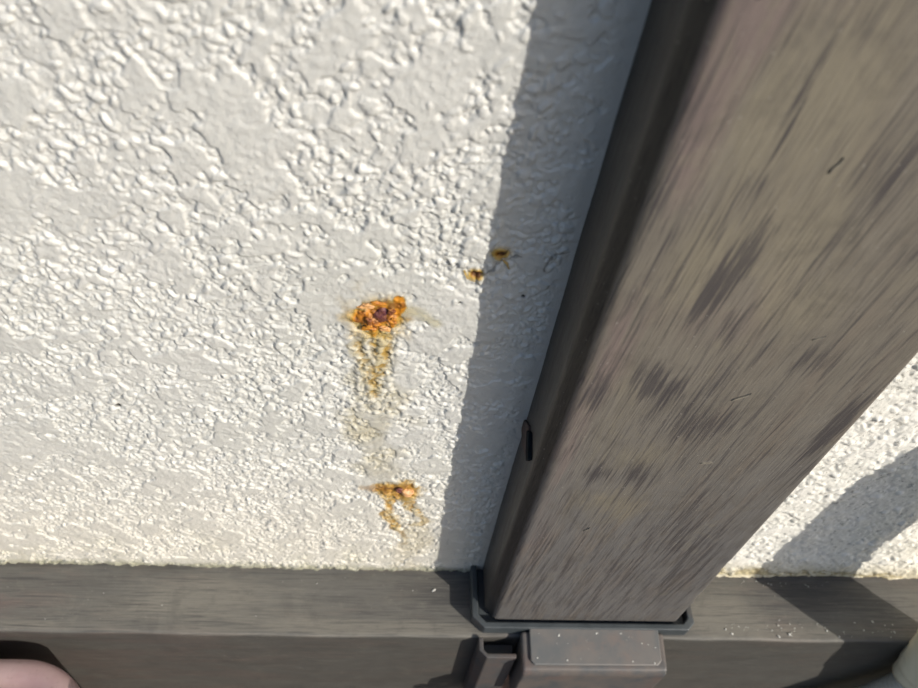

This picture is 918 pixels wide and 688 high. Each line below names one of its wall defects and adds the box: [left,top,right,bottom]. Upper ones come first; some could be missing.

rust [464,269,483,282]
rust [492,248,510,269]
rust [350,296,407,394]
rust [374,480,422,530]